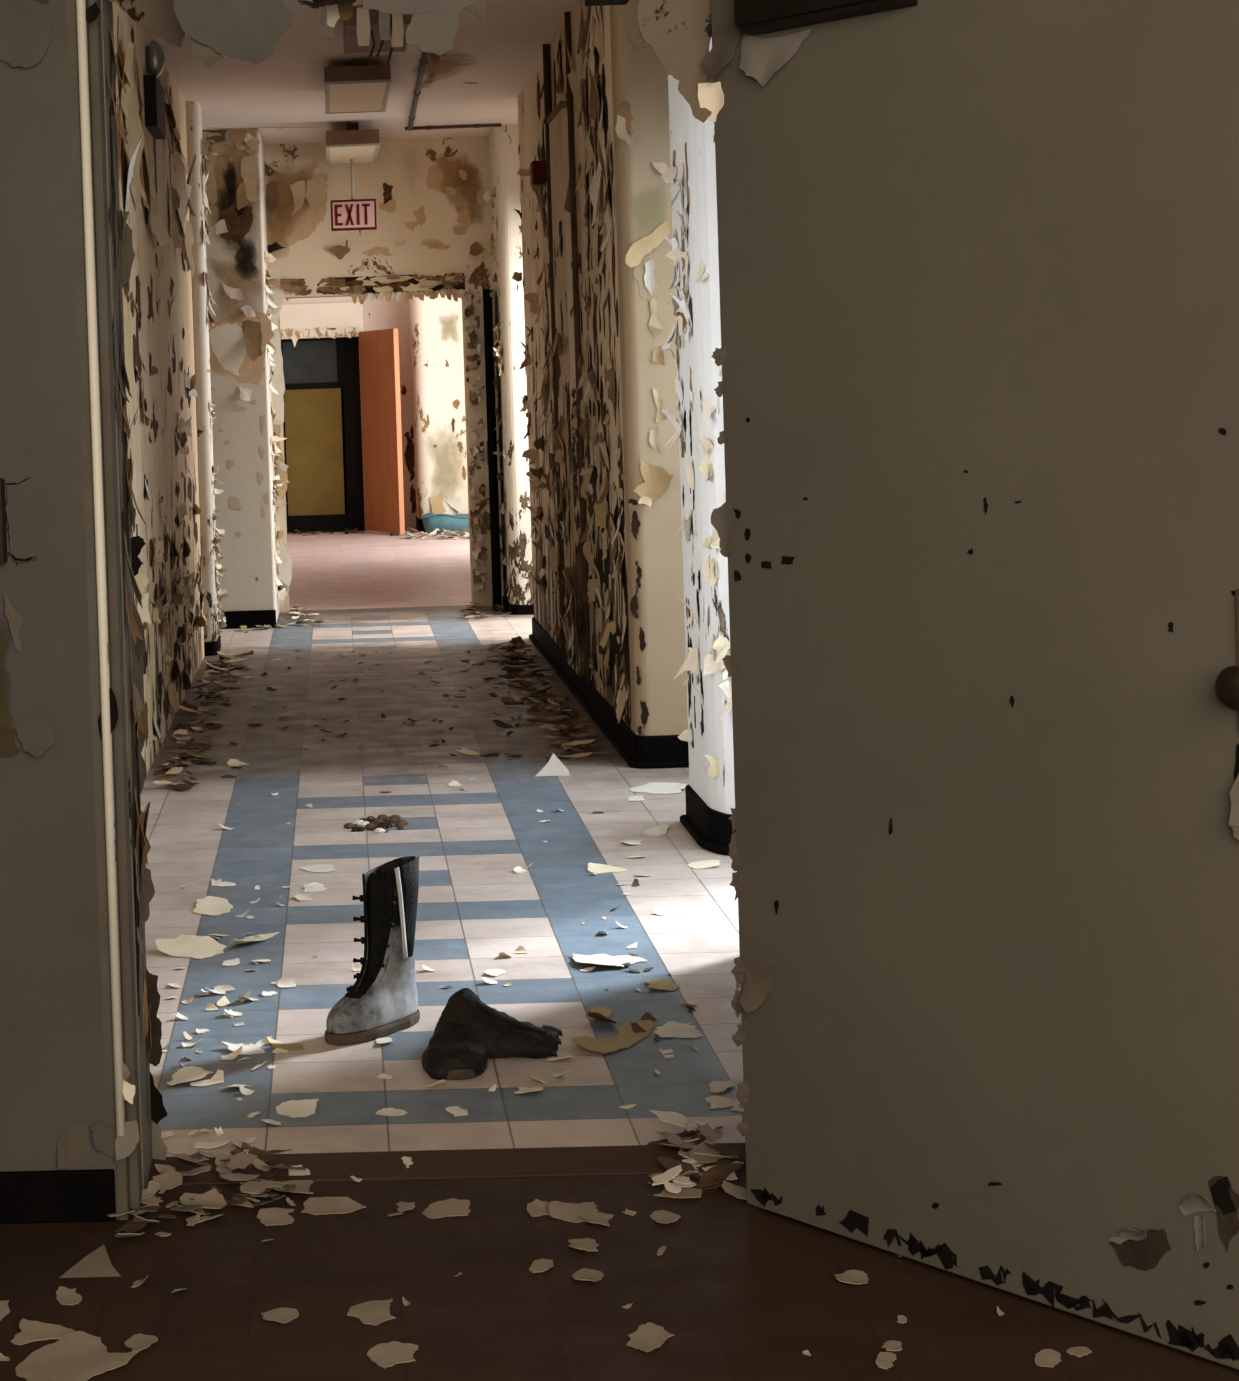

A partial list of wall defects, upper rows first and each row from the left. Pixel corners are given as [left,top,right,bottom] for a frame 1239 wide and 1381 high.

peeling [86,0,101,24]
flaking render [297,0,356,28]
water stain [447,162,479,219]
peeling [751,1188,782,1207]
peeling [815,1205,959,1270]
peeling [1108,1228,1171,1271]
peeling [1178,1176,1239,1269]
peeling [979,1265,1239,1361]
peeling [1035,1346,1092,1368]